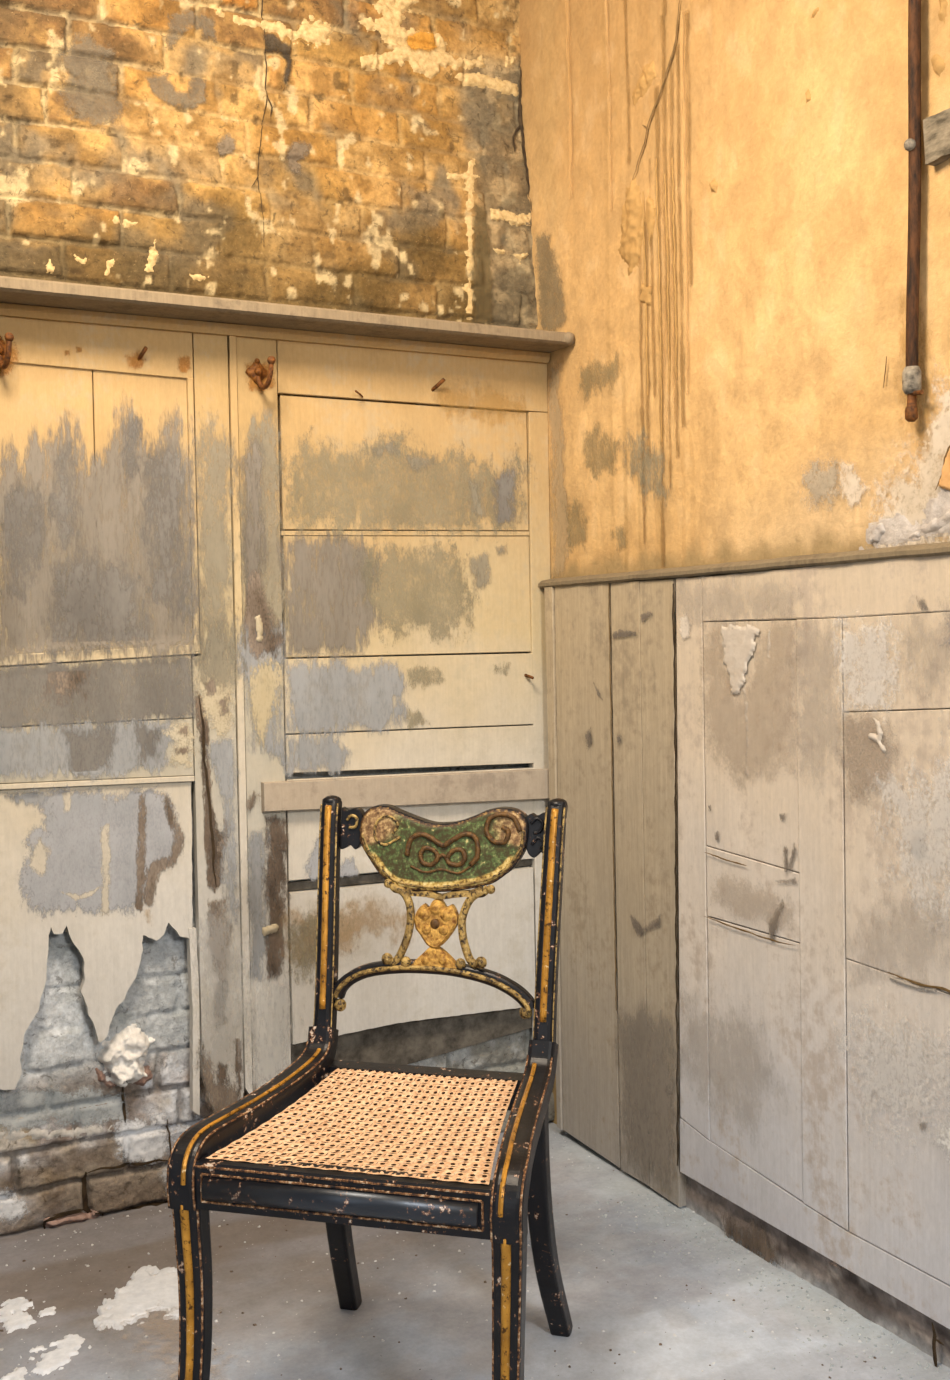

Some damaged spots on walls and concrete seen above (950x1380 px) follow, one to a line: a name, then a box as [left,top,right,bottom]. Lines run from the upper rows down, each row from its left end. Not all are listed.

crack [252,0,273,241]
crack [512,67,532,211]
flaking render [859,448,950,550]
peeling [721,623,771,778]
peeling [5,787,184,918]
crack [888,972,950,993]